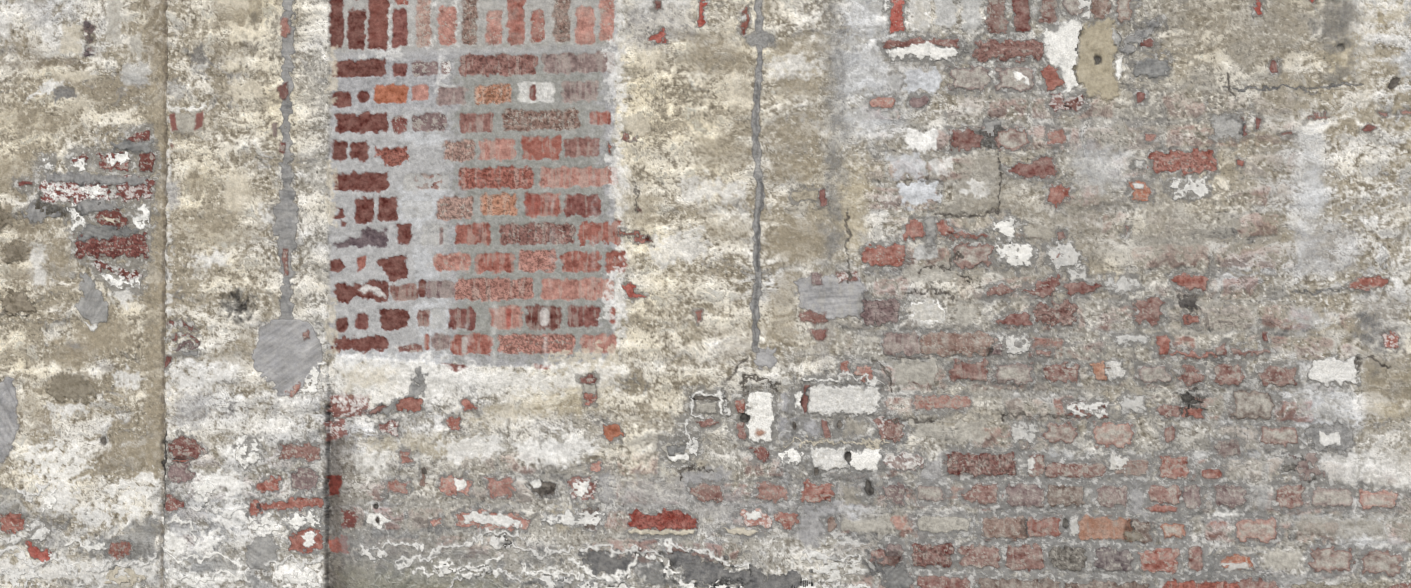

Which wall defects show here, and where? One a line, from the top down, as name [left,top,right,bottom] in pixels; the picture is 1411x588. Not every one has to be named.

peeling [648,0,668,44]
peeling [737,2,752,37]
peeling [869,0,1175,211]
peeling [12,123,161,295]
peeling [618,227,655,247]
crack [726,0,781,397]
peeling [1124,110,1330,203]
peeling [621,280,648,303]
spalling [626,210,1411,588]
peeling [160,429,210,518]
peeling [232,436,330,556]
crack [677,464,712,481]